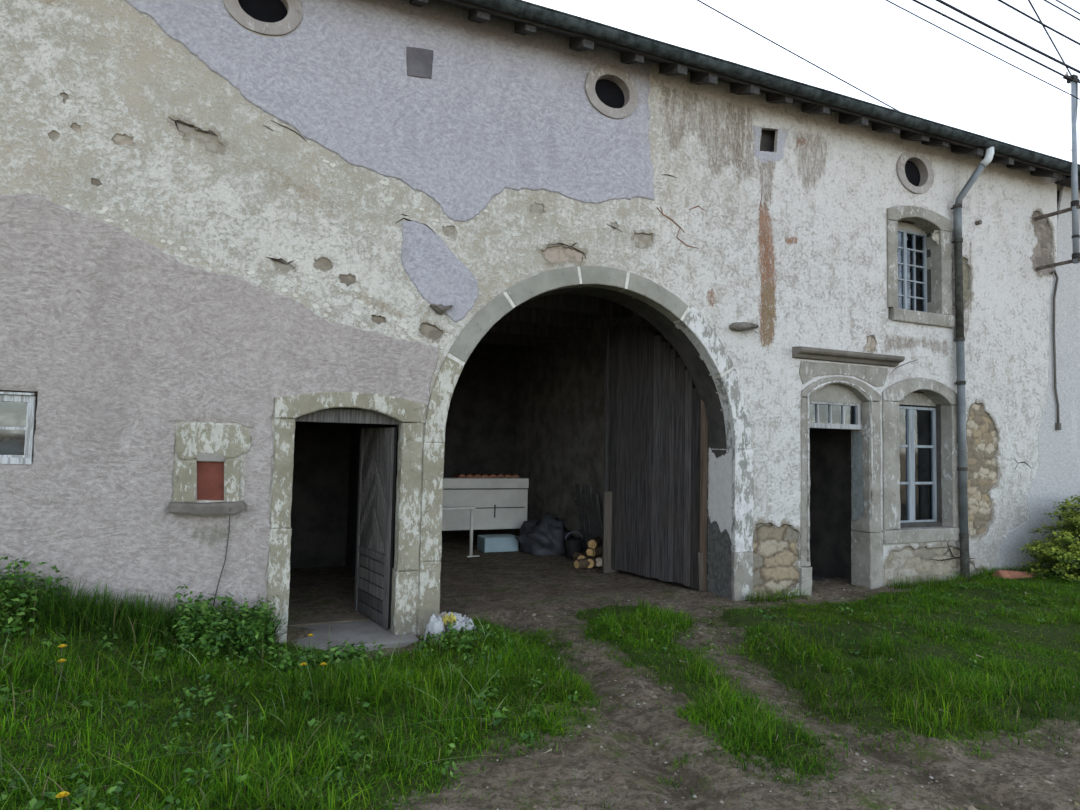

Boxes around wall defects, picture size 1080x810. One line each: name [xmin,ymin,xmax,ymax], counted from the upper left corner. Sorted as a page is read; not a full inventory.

spalling [170,116,227,154]
spalling [538,213,587,266]
corrosion [758,203,797,346]
spalling [1031,208,1056,277]
peeling [708,446,733,551]
spalling [966,399,1005,543]
spalling [753,519,801,599]
spalling [883,541,988,586]